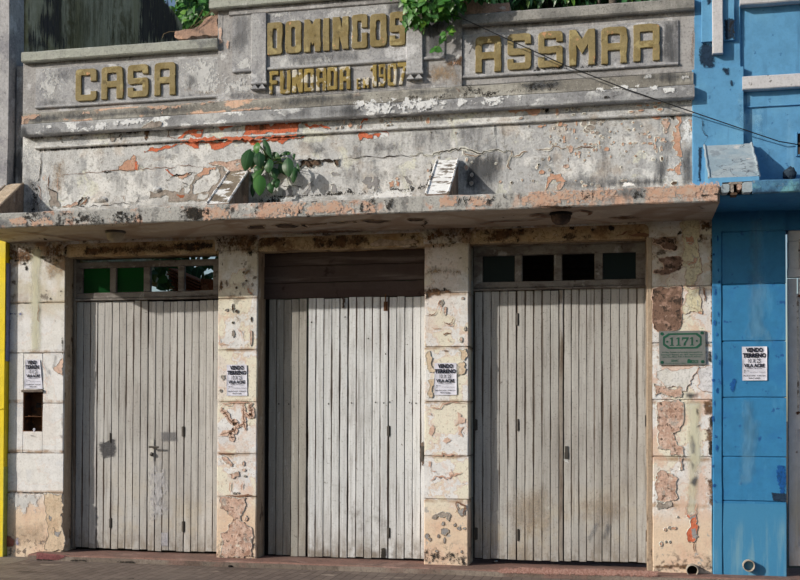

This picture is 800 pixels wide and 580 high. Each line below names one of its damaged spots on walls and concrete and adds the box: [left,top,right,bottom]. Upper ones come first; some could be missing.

water stain [28,0,95,51]
water stain [138,0,179,44]
crack [37,158,217,211]
flaking render [149,158,256,221]
peeling [71,95,452,172]
crack [344,144,597,169]
water stain [467,157,501,188]
peeling [457,94,721,206]
water stain [84,228,471,266]
water stain [425,288,451,299]
flaking render [651,220,721,332]
flaking render [653,353,721,510]